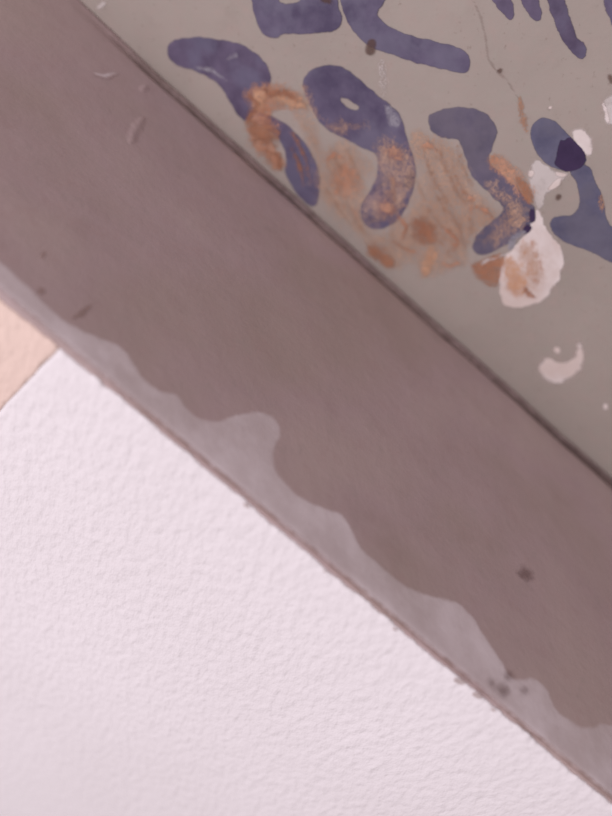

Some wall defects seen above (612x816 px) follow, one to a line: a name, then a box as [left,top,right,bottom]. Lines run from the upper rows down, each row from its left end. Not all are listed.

rust [242,82,331,207]
peeling [572,129,593,156]
rust [471,153,538,287]
peeling [498,160,568,308]
peeling [538,343,584,383]